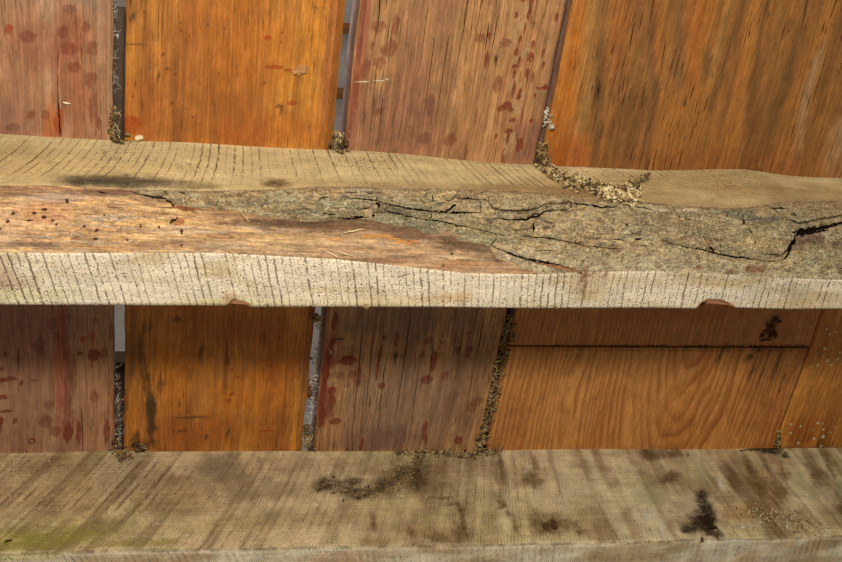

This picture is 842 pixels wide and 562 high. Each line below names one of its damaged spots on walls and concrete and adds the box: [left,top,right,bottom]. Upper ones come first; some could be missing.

crack [319,194,842,274]
damp [682,490,722,543]